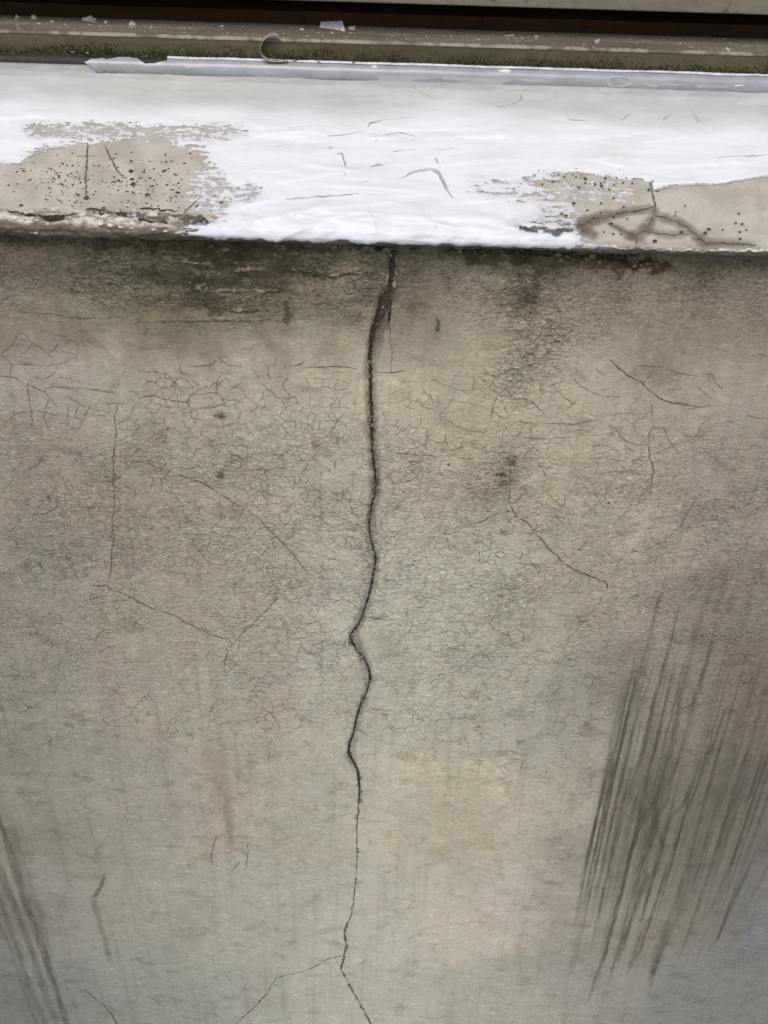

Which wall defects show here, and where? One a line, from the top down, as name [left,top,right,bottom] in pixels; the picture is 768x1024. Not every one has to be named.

spalling [2,152,223,233]
spalling [444,169,768,270]
crack [0,246,767,1024]